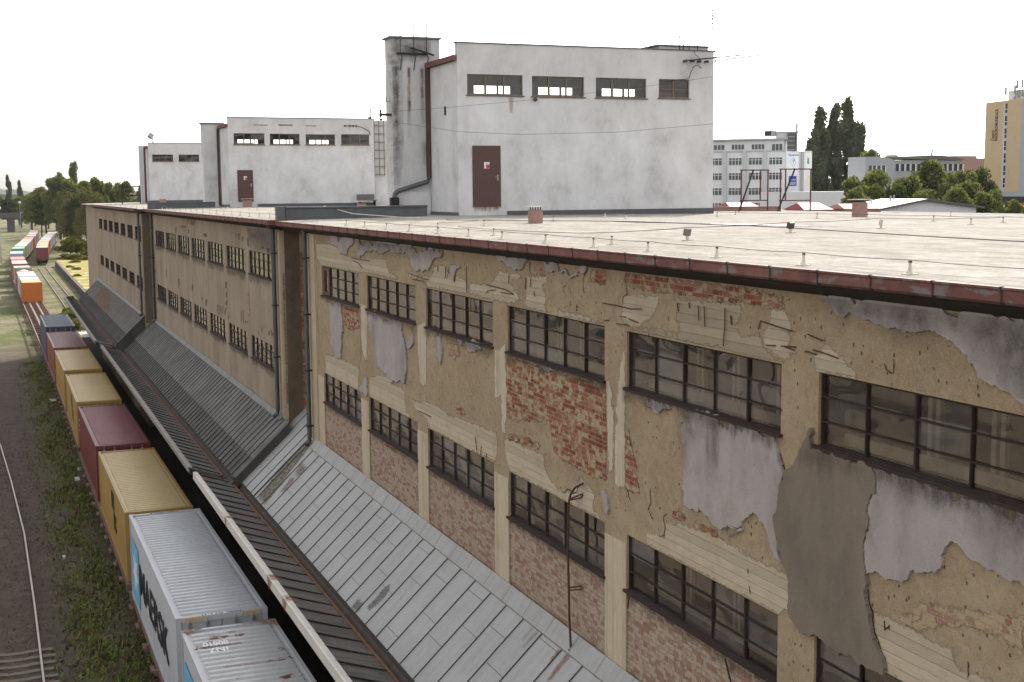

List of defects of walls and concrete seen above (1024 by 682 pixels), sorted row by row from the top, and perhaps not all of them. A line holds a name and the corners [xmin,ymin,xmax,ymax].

spalling [316,236,606,325]
spalling [325,301,639,522]
spalling [813,344,856,379]
flaking render [821,294,1024,405]
flaking render [645,409,789,614]
flaking render [864,468,1024,586]